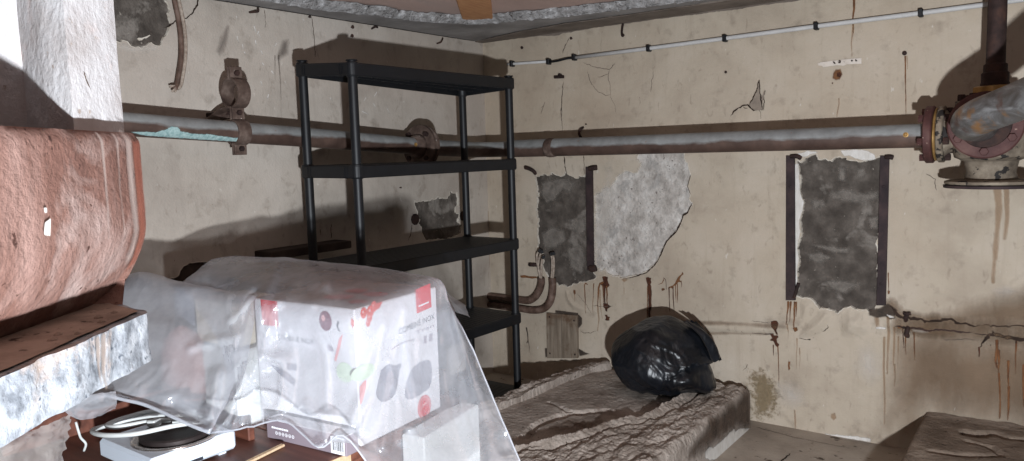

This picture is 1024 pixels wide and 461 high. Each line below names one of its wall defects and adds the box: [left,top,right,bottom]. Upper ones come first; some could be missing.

spalling [113,0,172,49]
flaking render [732,81,766,119]
spalling [414,191,462,241]
spalling [535,153,693,287]
spalling [795,150,880,314]
rust [573,276,611,321]
rust [646,272,683,318]
rust [770,301,798,373]
crack [890,306,1024,347]
rust [995,340,1024,420]